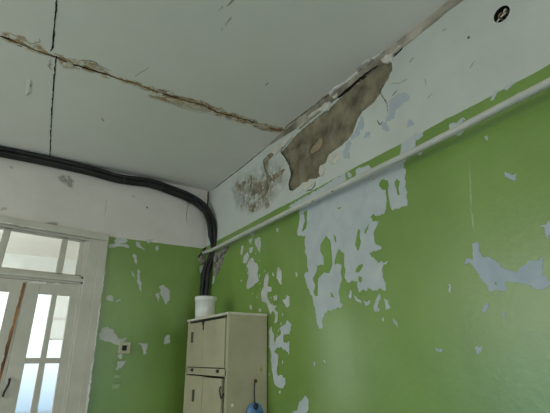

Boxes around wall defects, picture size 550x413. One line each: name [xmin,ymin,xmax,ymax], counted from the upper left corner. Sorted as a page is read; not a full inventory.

crack [0,0,285,156]
peeling [235,45,424,329]
peeling [94,304,126,348]
peeling [155,285,170,304]
peeling [240,237,291,394]
peeling [464,242,550,291]